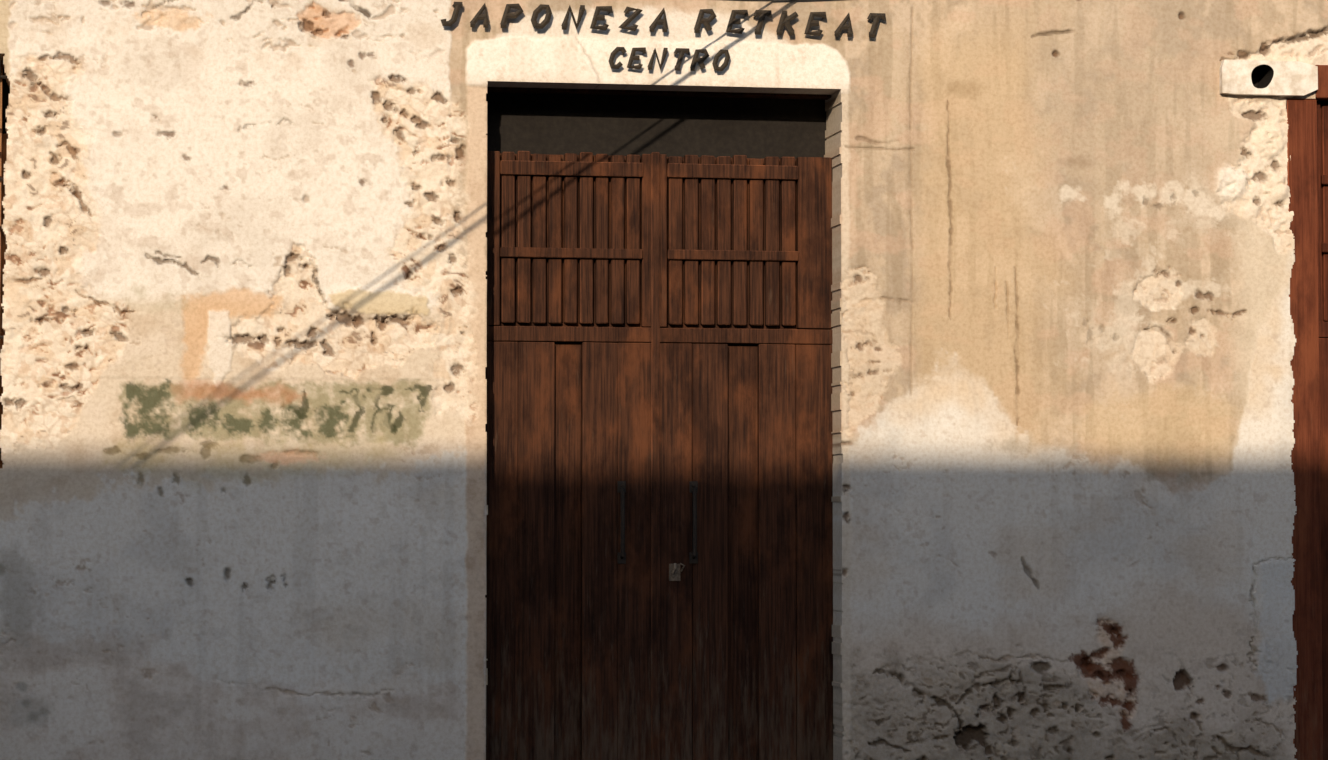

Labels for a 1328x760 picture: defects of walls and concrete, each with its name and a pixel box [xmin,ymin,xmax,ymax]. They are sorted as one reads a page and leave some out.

spalling [121,2,203,33]
spalling [297,1,362,40]
spalling [348,53,375,69]
spalling [1220,27,1328,65]
spalling [0,52,136,456]
spalling [104,75,480,497]
spalling [841,267,902,438]
spalling [1083,267,1248,383]
flaking render [976,619,1140,735]
peeling [1248,556,1298,707]